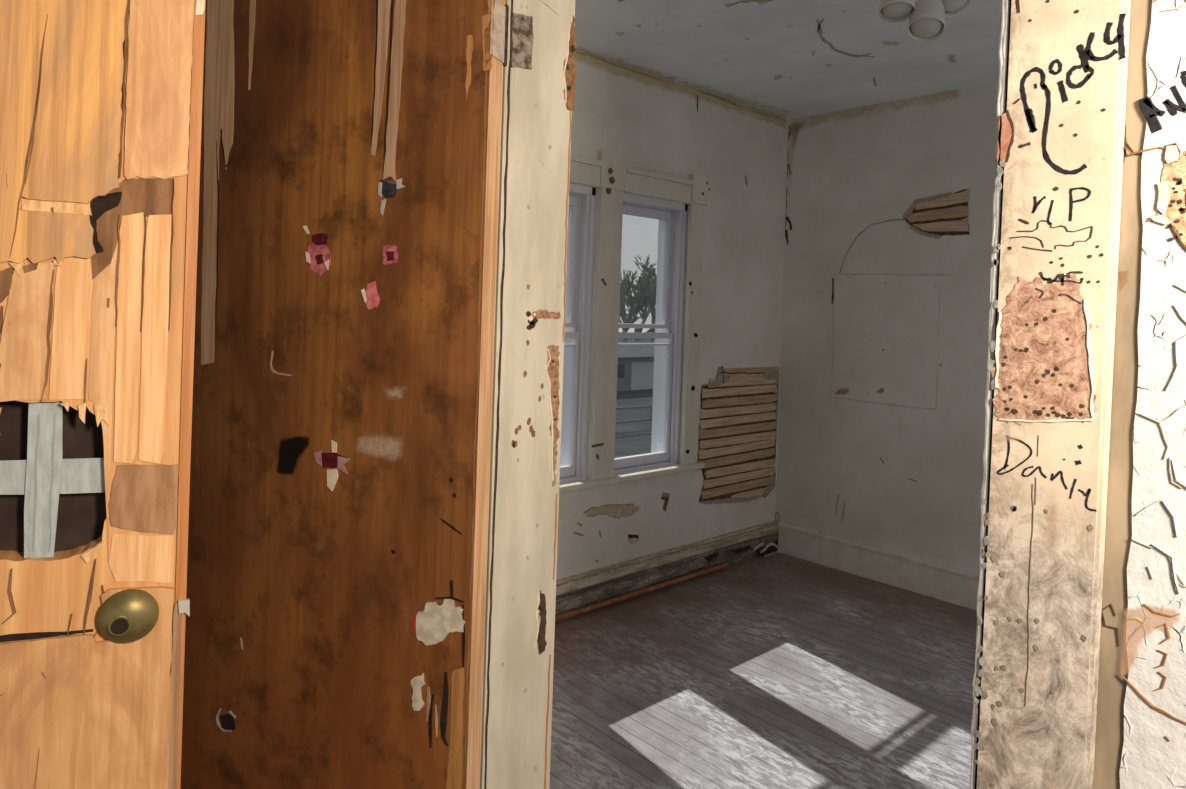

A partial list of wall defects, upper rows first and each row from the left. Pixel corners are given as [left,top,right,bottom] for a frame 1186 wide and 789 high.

spalling [903,189,970,239]
peeling [997,110,1014,191]
crack [1123,125,1166,164]
spalling [1148,143,1186,248]
peeling [526,16,577,580]
peeling [987,274,1097,425]
peeling [511,417,535,462]
spalling [686,366,780,504]
peeling [583,503,641,519]
crack [1101,285,1186,742]
peeling [534,590,551,789]
peeling [974,657,986,705]